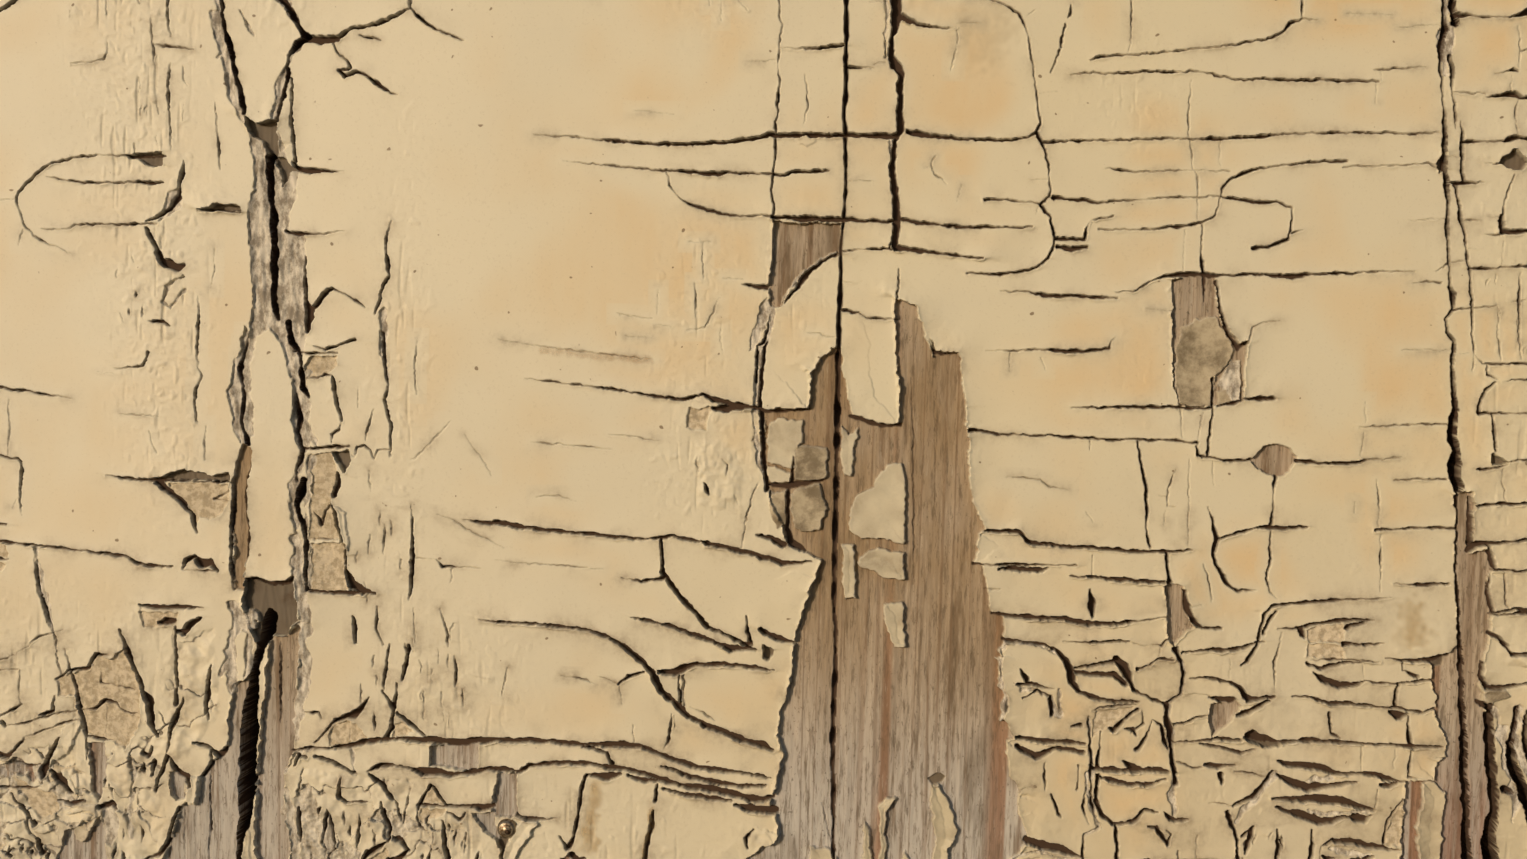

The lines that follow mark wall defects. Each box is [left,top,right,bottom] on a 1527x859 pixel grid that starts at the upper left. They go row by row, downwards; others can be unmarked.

peeling [0,601,263,859]
peeling [104,468,235,535]
crack [0,0,482,859]
peeling [143,46,1086,859]
crack [349,0,1527,859]
peeling [1115,269,1418,406]